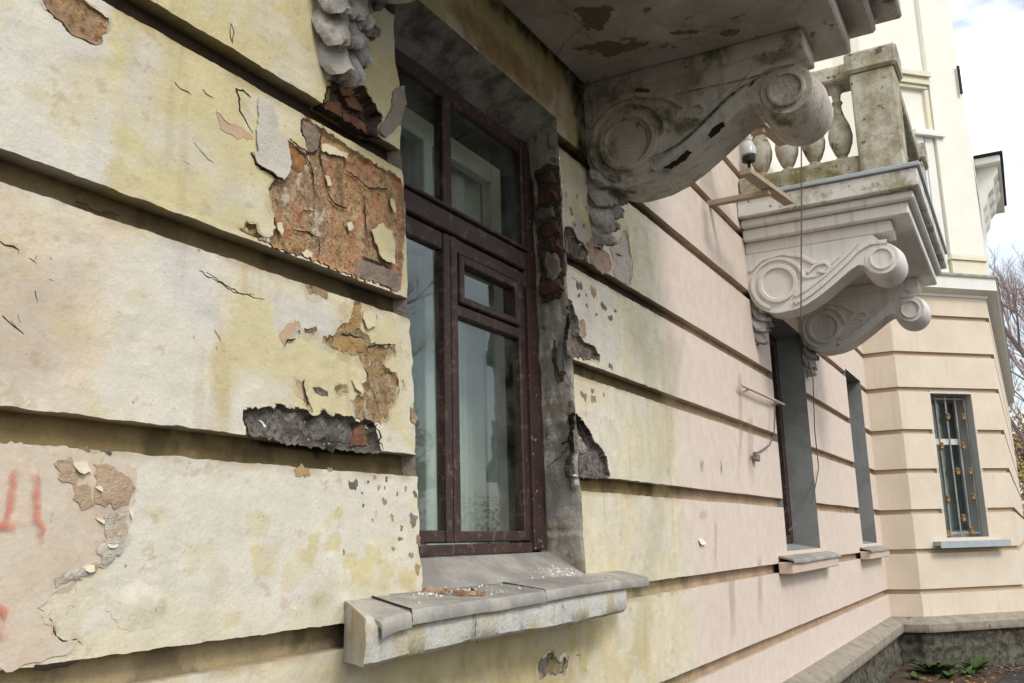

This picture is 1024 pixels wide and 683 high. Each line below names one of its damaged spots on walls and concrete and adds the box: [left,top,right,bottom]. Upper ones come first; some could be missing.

peeling [38,0,113,44]
peeling [573,6,650,57]
crack [175,82,278,179]
peeling [240,97,406,293]
crack [199,270,265,300]
flaking render [534,163,633,369]
flaking render [243,303,407,454]
flaking render [564,412,610,480]
flaking render [534,649,569,681]